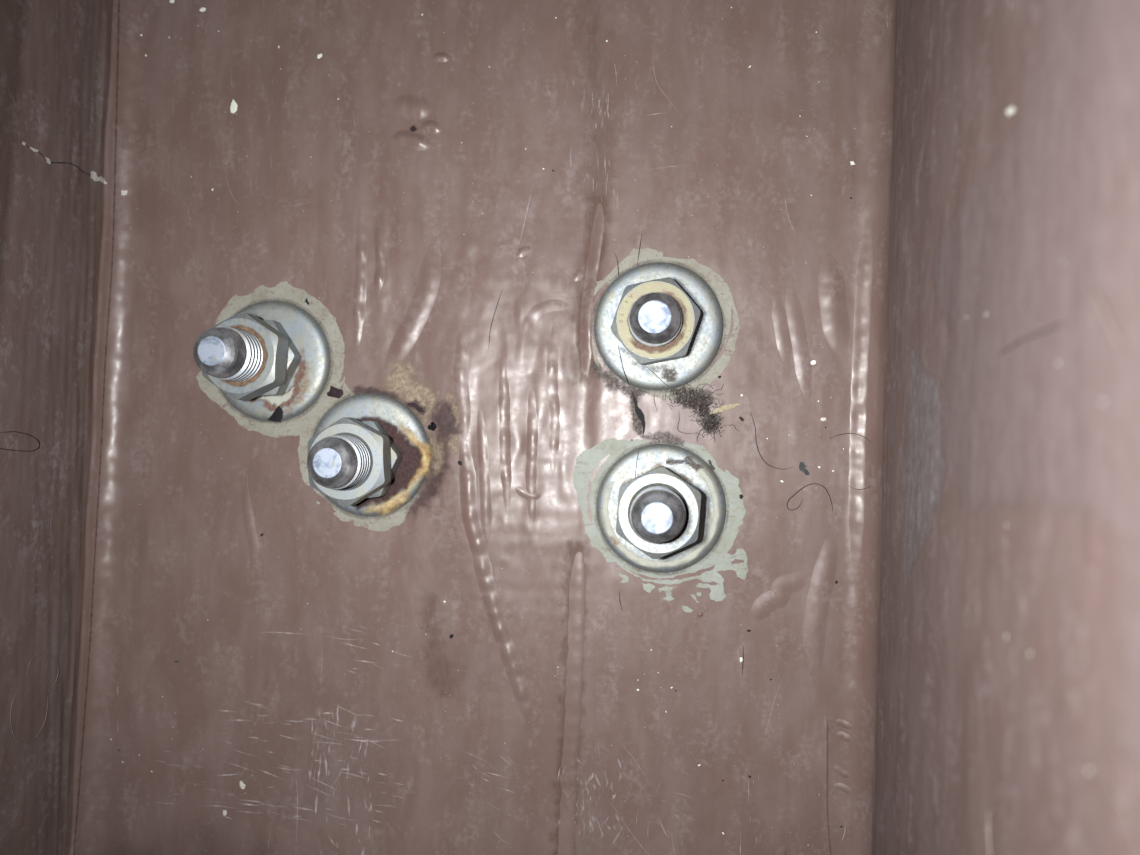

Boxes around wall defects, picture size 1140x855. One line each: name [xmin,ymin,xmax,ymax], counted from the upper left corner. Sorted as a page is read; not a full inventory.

corrosion [222,325,268,387]
corrosion [251,353,309,411]
peeling [196,281,422,531]
corrosion [354,362,459,513]
peeling [573,438,749,612]